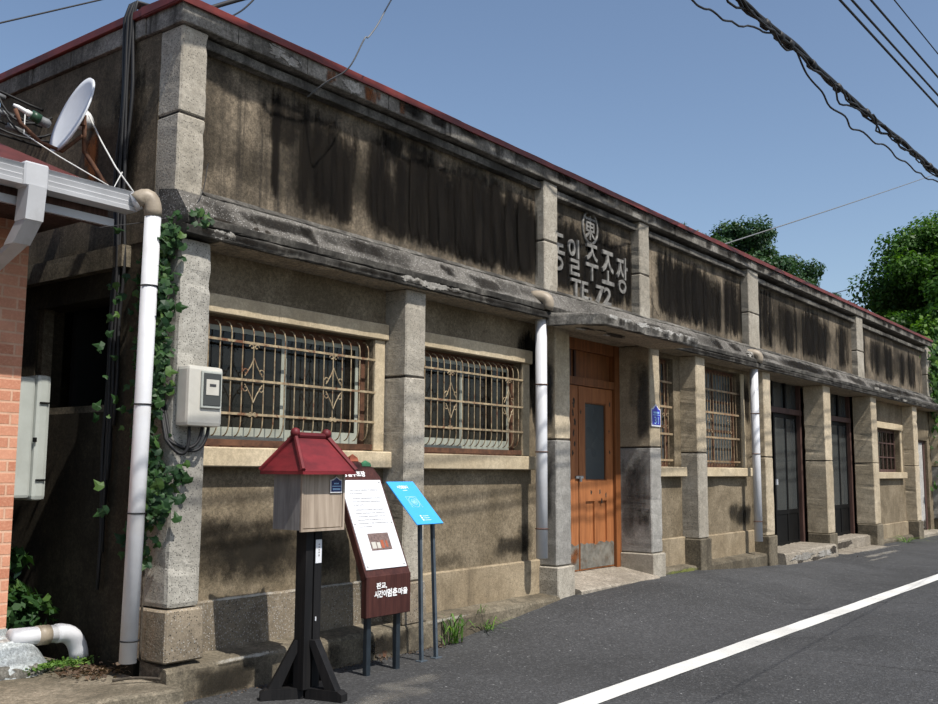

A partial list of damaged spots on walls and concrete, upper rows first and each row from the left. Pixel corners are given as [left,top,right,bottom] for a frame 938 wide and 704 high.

water stain [264,92,357,223]
water stain [367,130,538,275]
water stain [242,213,318,244]
water stain [355,241,380,256]
water stain [451,275,515,307]
water stain [608,253,749,363]
water stain [758,289,937,409]
water stain [730,504,750,524]
water stain [498,533,528,553]